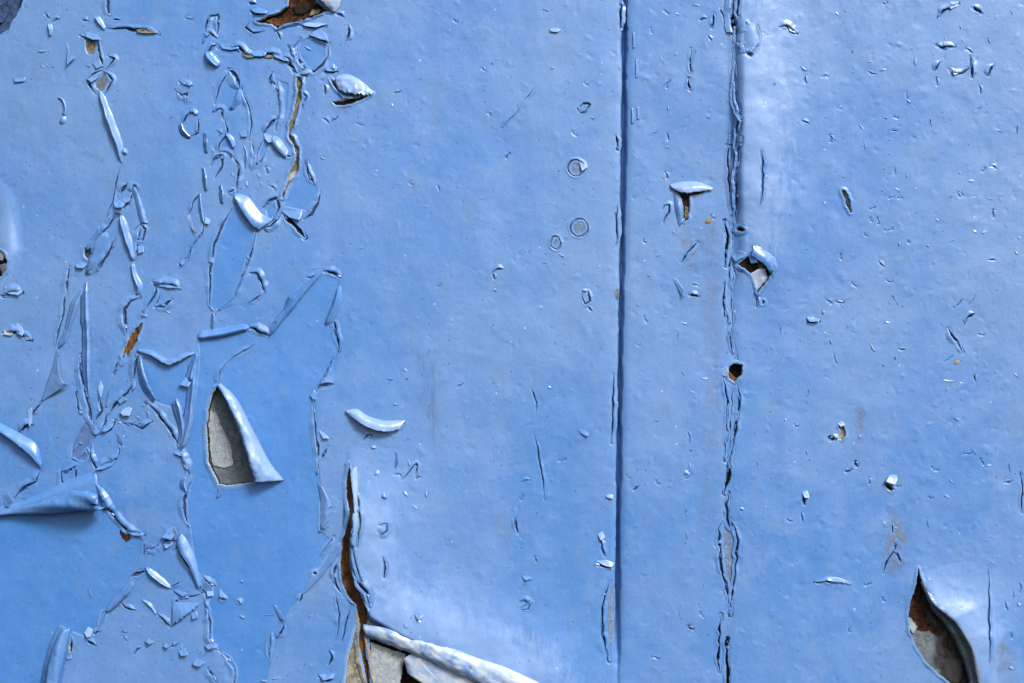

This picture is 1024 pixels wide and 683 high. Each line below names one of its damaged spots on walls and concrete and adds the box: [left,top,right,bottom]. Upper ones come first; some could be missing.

crack [105,16,160,36]
crack [216,40,313,202]
peeling [323,63,376,123]
crack [202,132,237,204]
peeling [661,172,715,234]
peeling [731,245,778,308]
corrosion [111,306,147,376]
peeling [0,0,354,683]
crack [712,0,768,683]
peeling [346,409,410,448]
peeling [317,613,539,683]
spalling [904,564,951,683]